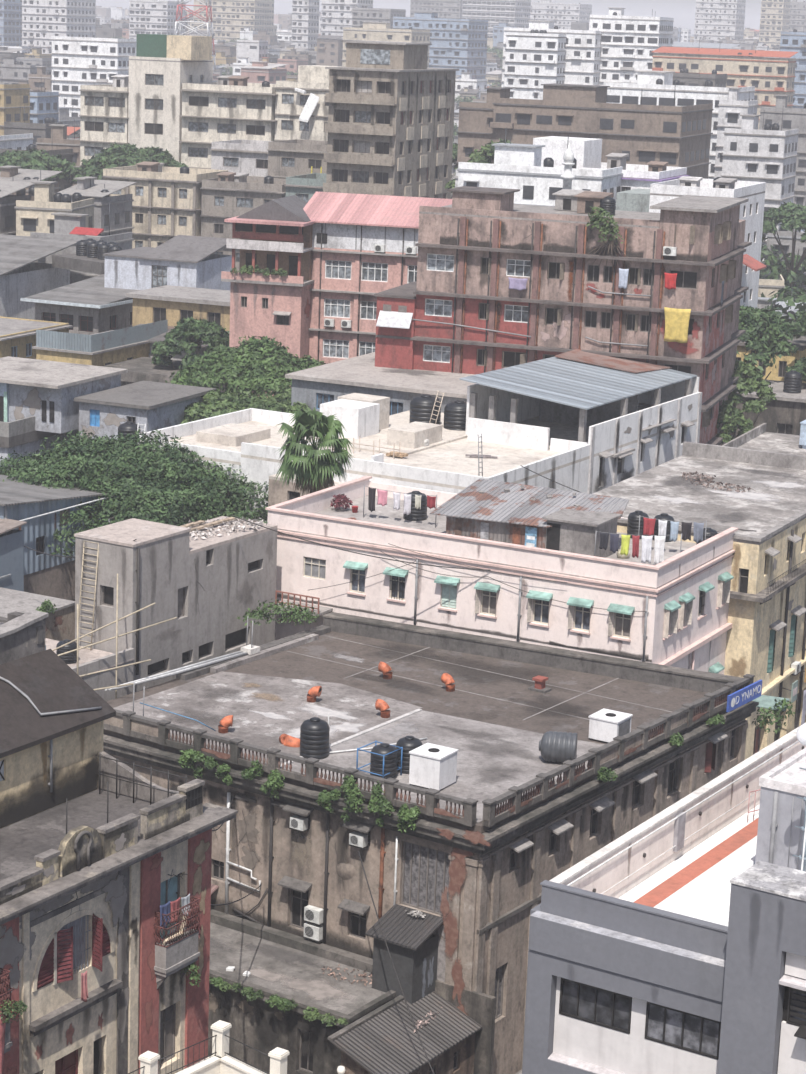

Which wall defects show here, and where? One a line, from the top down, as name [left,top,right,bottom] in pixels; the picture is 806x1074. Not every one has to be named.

leakage [440,220,644,258]
leakage [661,254,708,262]
flaking render [14,388,41,420]
leakage [203,785,256,803]
peeling [193,839,210,978]
leakage [211,900,304,937]
flaking render [0,872,130,1045]
leakage [320,934,373,959]